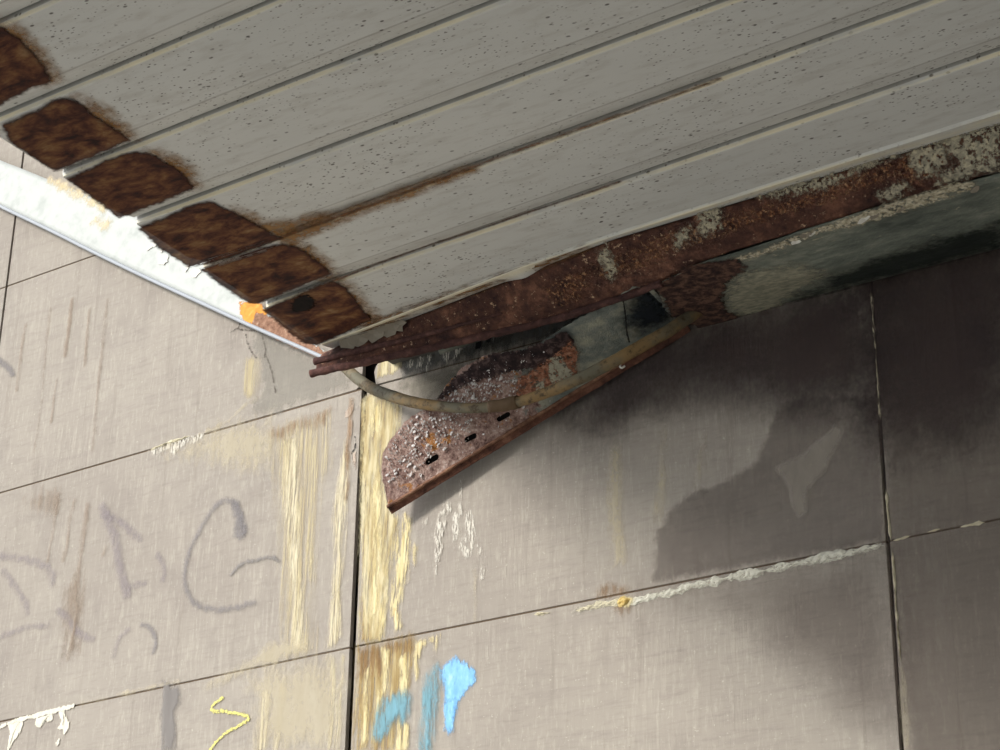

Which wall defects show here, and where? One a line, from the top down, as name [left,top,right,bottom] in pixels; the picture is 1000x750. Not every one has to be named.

rust [0,25,58,106]
rust [2,98,199,229]
rust [138,78,721,357]
rust [437,332,578,399]
rust [655,259,748,328]
rust [544,145,949,305]
water stain [561,221,1000,439]
water stain [576,492,910,660]